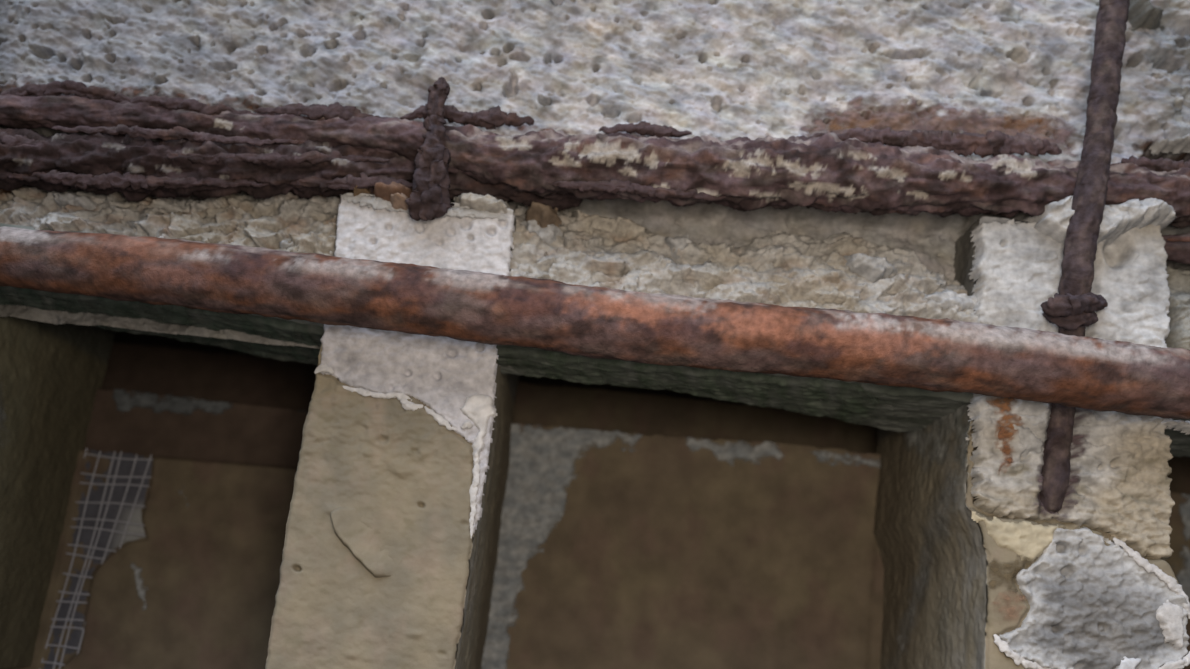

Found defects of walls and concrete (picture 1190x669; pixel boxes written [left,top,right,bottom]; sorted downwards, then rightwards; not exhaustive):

rust [0,75,428,202]
spalling [0,182,1064,333]
rust [0,226,1190,468]
rust [443,96,1081,218]
spalling [1085,224,1190,350]
rust [1105,140,1190,264]
flaking render [44,450,152,669]
flaking render [314,324,498,539]
peeling [481,423,643,669]
peeling [686,437,783,466]
rust [1038,434,1087,516]
spalling [966,393,1190,669]